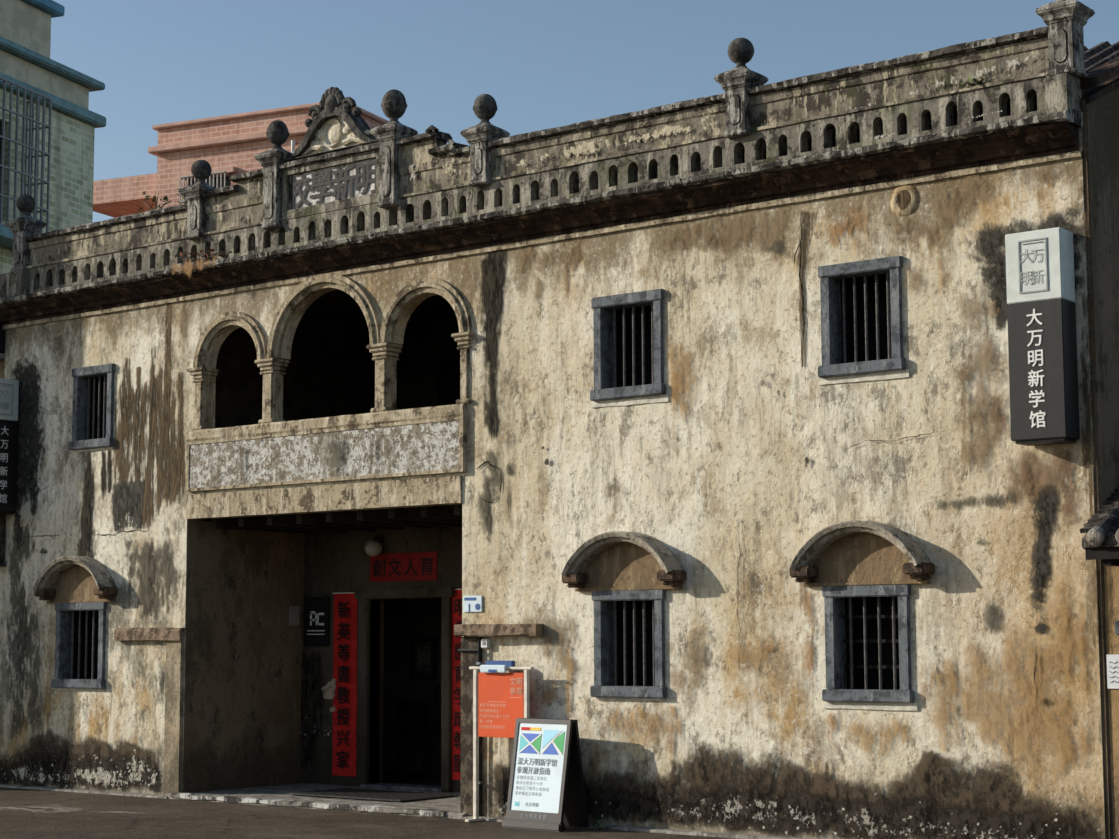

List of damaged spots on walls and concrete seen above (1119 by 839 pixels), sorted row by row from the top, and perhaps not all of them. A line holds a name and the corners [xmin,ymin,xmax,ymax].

water stain [0,358,159,791]
water stain [77,301,187,621]
water stain [490,763,510,811]
water stain [473,241,580,541]
water stain [668,345,693,417]
water stain [584,486,1097,839]
water stain [950,206,1097,523]